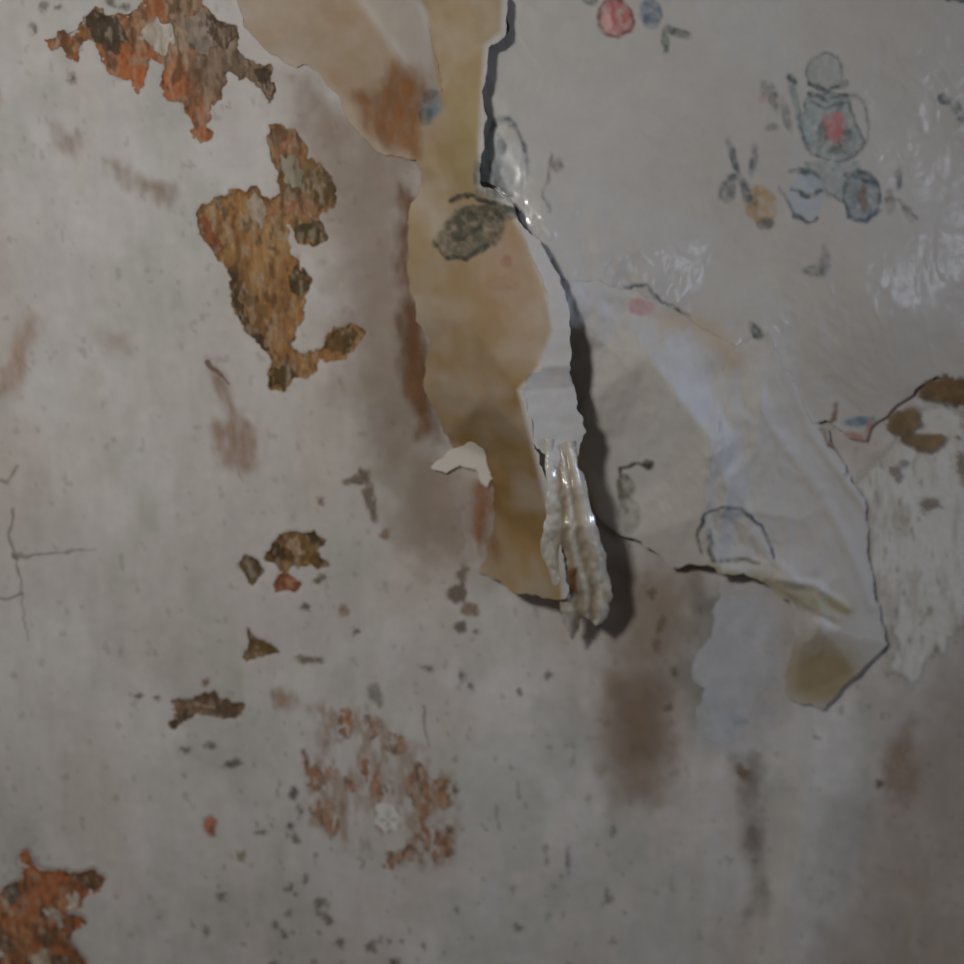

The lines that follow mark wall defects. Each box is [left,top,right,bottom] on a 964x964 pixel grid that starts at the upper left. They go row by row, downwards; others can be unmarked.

flaking render [33,0,276,143]
flaking render [196,123,366,392]
flaking render [344,469,376,520]
flaking render [238,530,330,593]
flaking render [449,568,477,632]
flaking render [168,681,245,729]
flaking render [0,849,105,964]